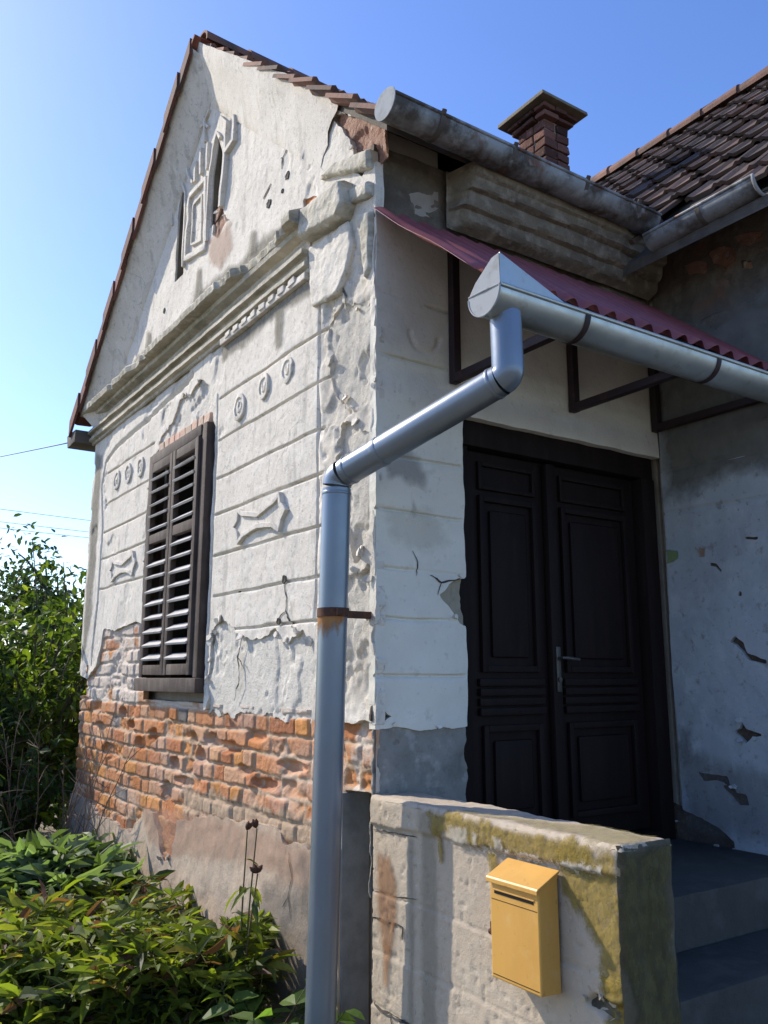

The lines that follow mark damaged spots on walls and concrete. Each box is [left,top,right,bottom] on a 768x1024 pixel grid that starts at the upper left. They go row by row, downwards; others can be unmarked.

spalling [334,114,389,164]
damp [194,230,277,300]
crack [413,552,460,593]
rust [317,616,344,631]
spalling [440,574,463,625]
spalling [733,637,767,663]
flaking render [74,614,315,861]
spalling [735,718,761,743]
damp [449,827,603,876]
rust [378,856,395,984]